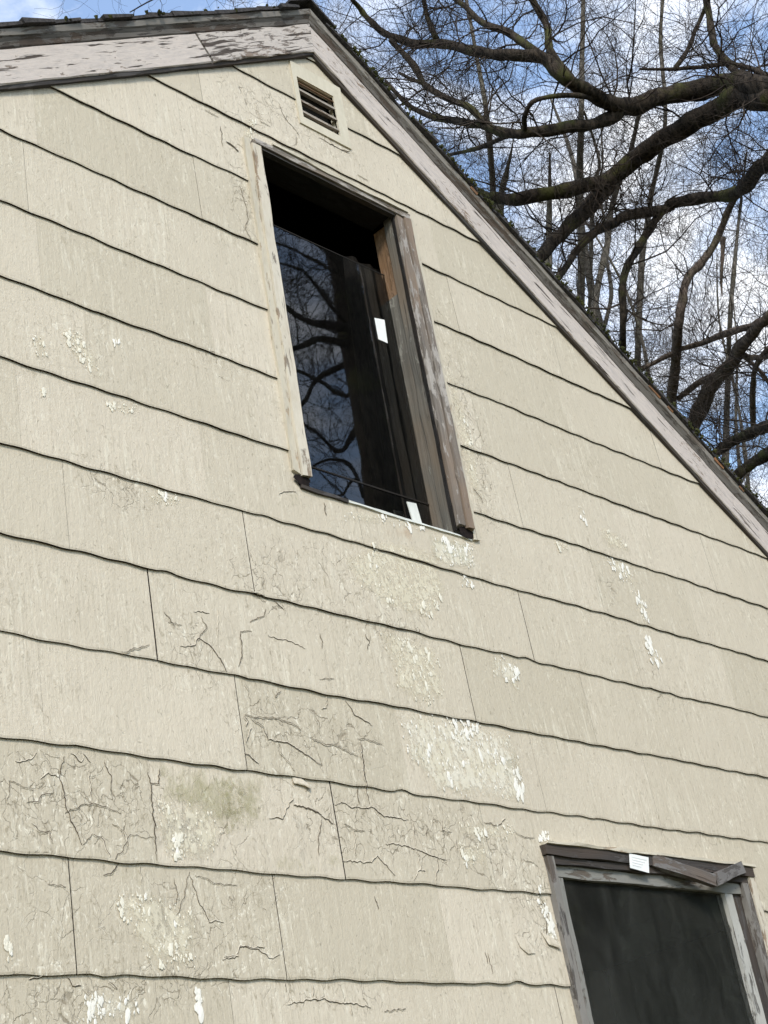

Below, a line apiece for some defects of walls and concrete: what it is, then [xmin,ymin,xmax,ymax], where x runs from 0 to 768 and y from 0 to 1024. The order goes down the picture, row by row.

peeling [60,328,101,377]
peeling [348,535,475,618]
peeling [600,529,663,668]
crack [164,592,458,884]
peeling [380,632,525,802]
crack [7,752,161,886]
peeling [116,891,196,971]
peeling [77,991,139,1024]
peeling [194,986,204,1024]